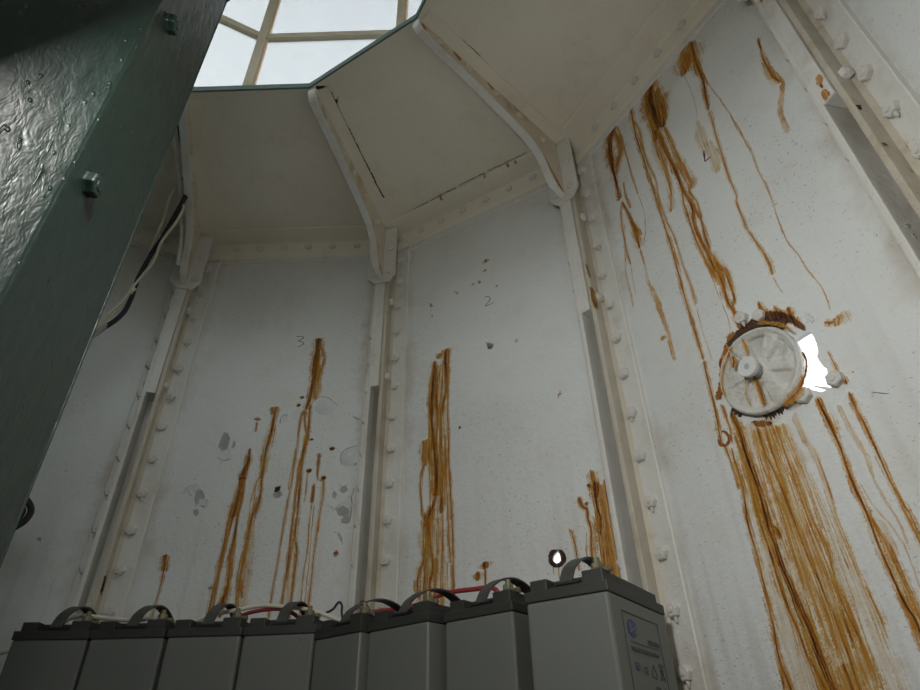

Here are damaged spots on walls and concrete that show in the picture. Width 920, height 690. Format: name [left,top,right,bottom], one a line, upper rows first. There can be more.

rust [679,41,773,275]
rust [758,38,789,128]
rust [816,74,830,100]
rust [151,555,169,617]
rust [208,407,279,617]
rust [268,338,325,619]
rust [413,348,456,605]
rust [569,471,621,578]
rust [602,80,884,690]
rust [815,397,920,646]
rust [828,352,920,543]